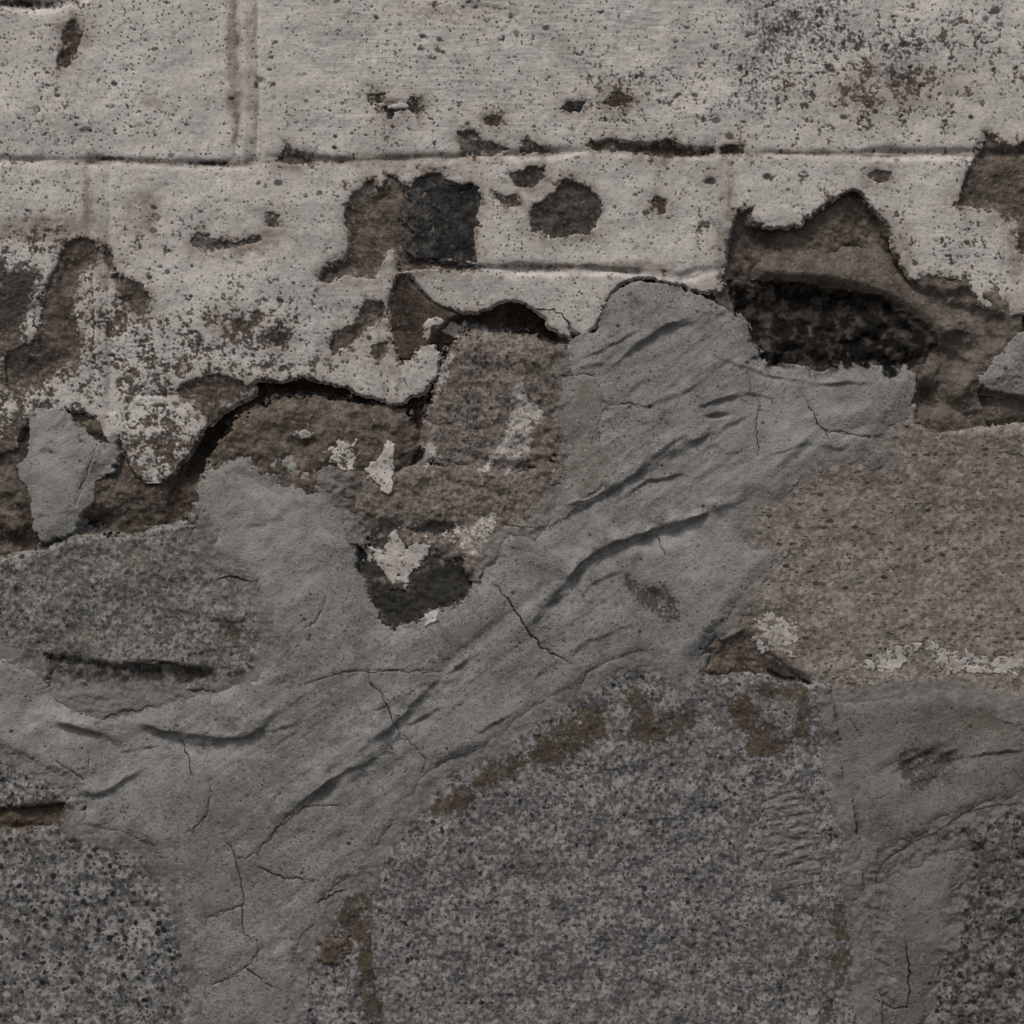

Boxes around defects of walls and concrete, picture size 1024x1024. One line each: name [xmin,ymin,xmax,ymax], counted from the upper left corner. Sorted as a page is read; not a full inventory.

spalling [955,132,1024,254]
spalling [6,239,150,388]
spalling [160,112,603,525]
spalling [712,191,1022,433]
spalling [357,513,499,631]
crack [494,584,570,665]
crack [310,669,431,771]
crack [180,740,212,833]
crack [210,804,346,988]